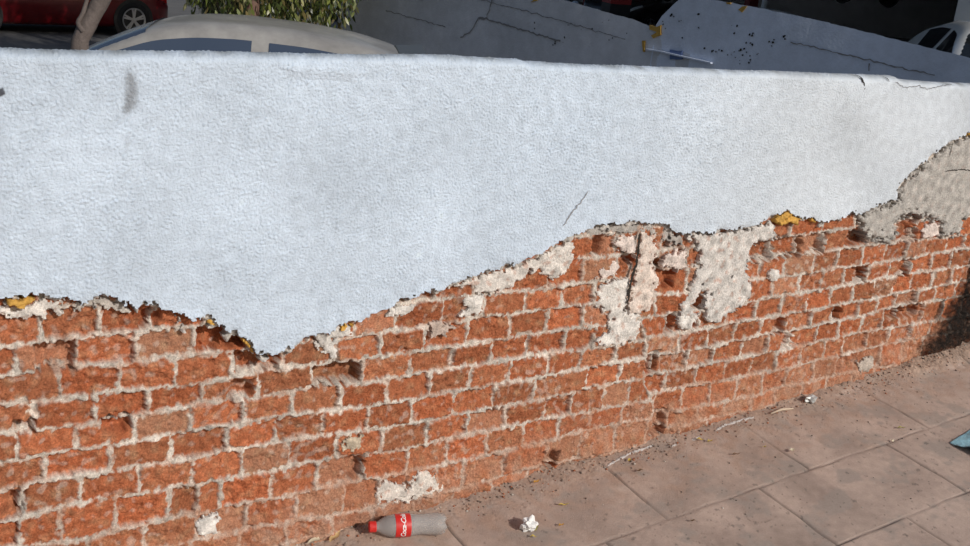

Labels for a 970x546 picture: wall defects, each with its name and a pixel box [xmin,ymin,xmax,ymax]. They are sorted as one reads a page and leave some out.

crack [386,0,625,42]
flaking render [0,132,970,546]